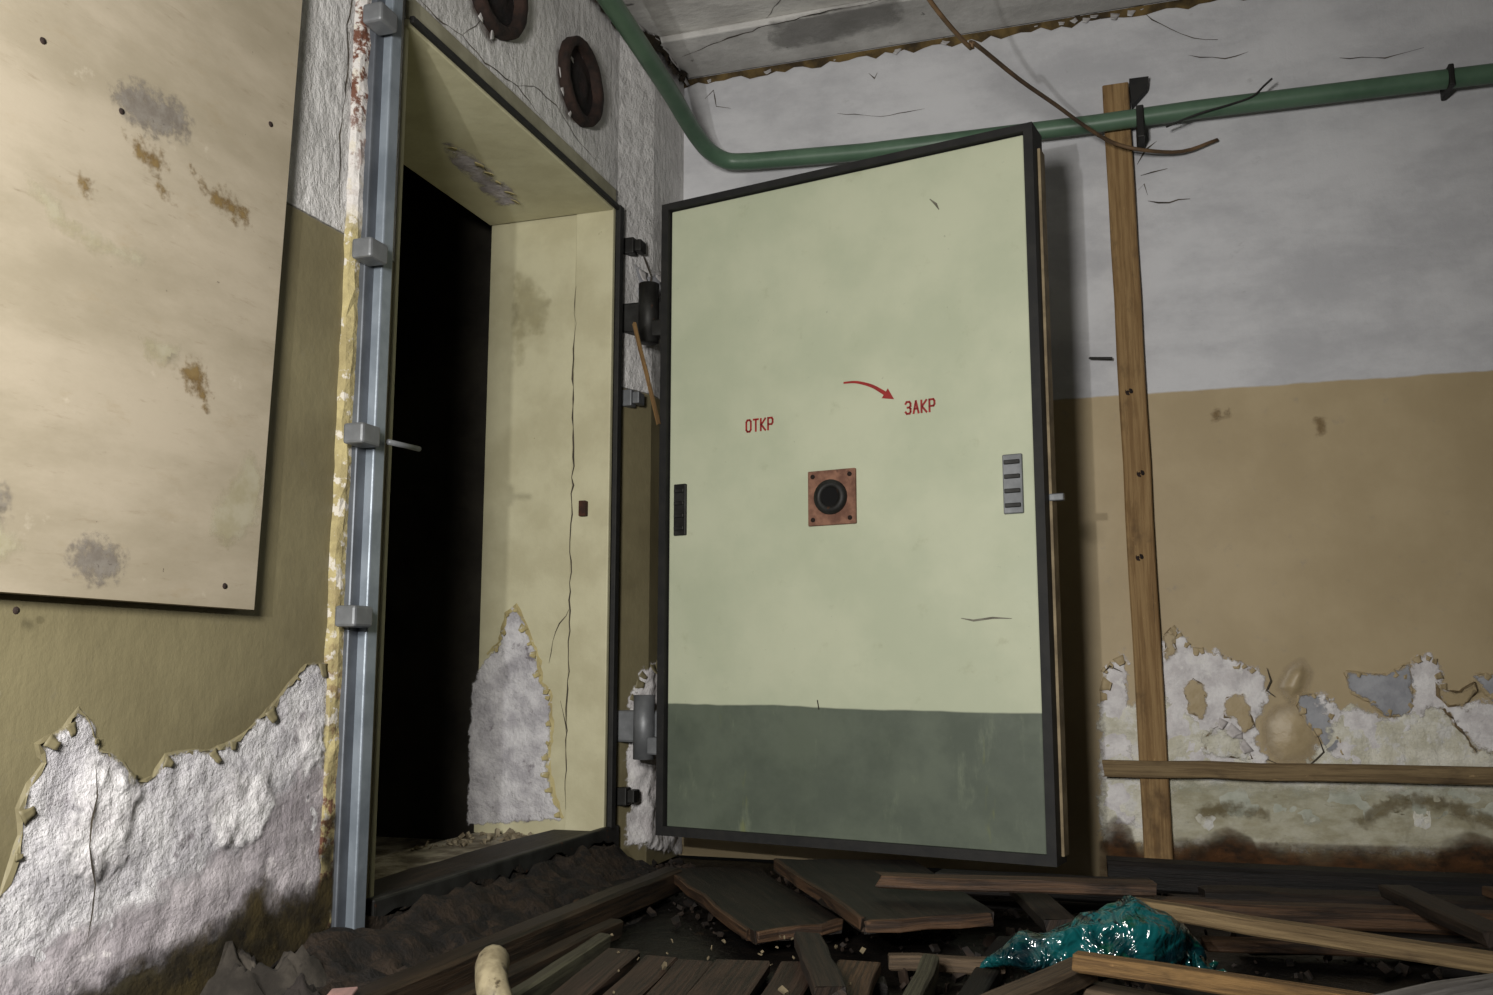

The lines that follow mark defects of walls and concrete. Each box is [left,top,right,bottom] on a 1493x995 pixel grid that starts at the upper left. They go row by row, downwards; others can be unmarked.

leakage [114,84,188,139]
peeling [0,662,328,995]
peeling [467,603,564,825]
peeling [1098,655,1135,829]
leakage [1096,703,1143,844]
peeling [1161,625,1269,763]
leakage [1164,696,1493,856]
peeling [1296,652,1493,764]